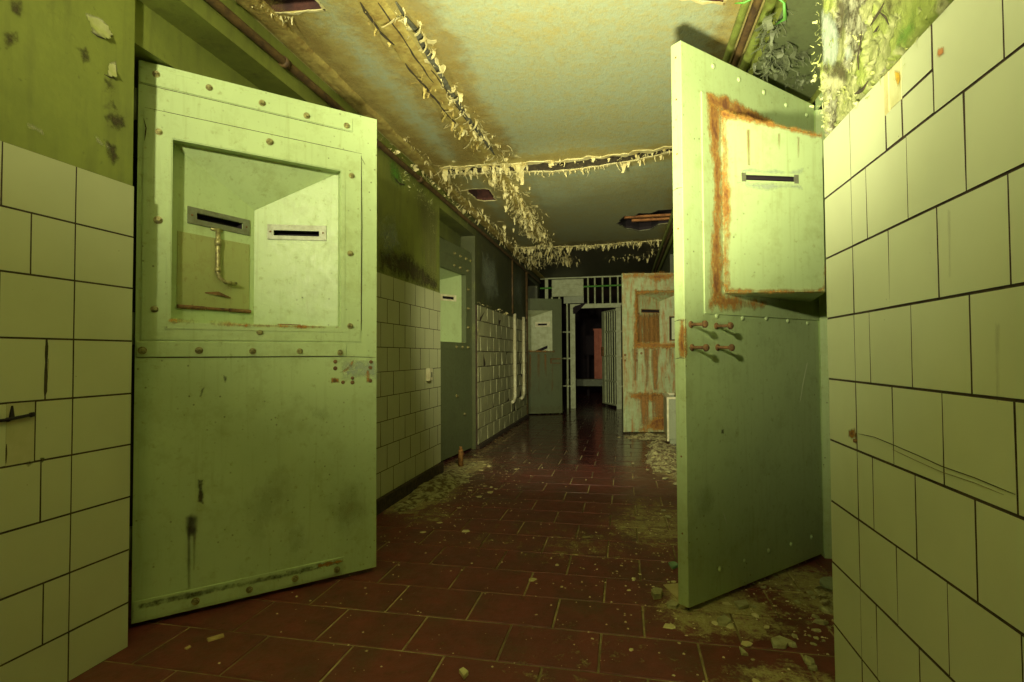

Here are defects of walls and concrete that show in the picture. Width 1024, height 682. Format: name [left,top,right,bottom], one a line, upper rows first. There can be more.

peeling [87,14,113,39]
water stain [837,0,846,36]
peeling [104,62,117,78]
water stain [823,64,846,81]
peeling [357,8,673,271]
corrosion [707,93,823,310]
corrosion [623,272,687,431]